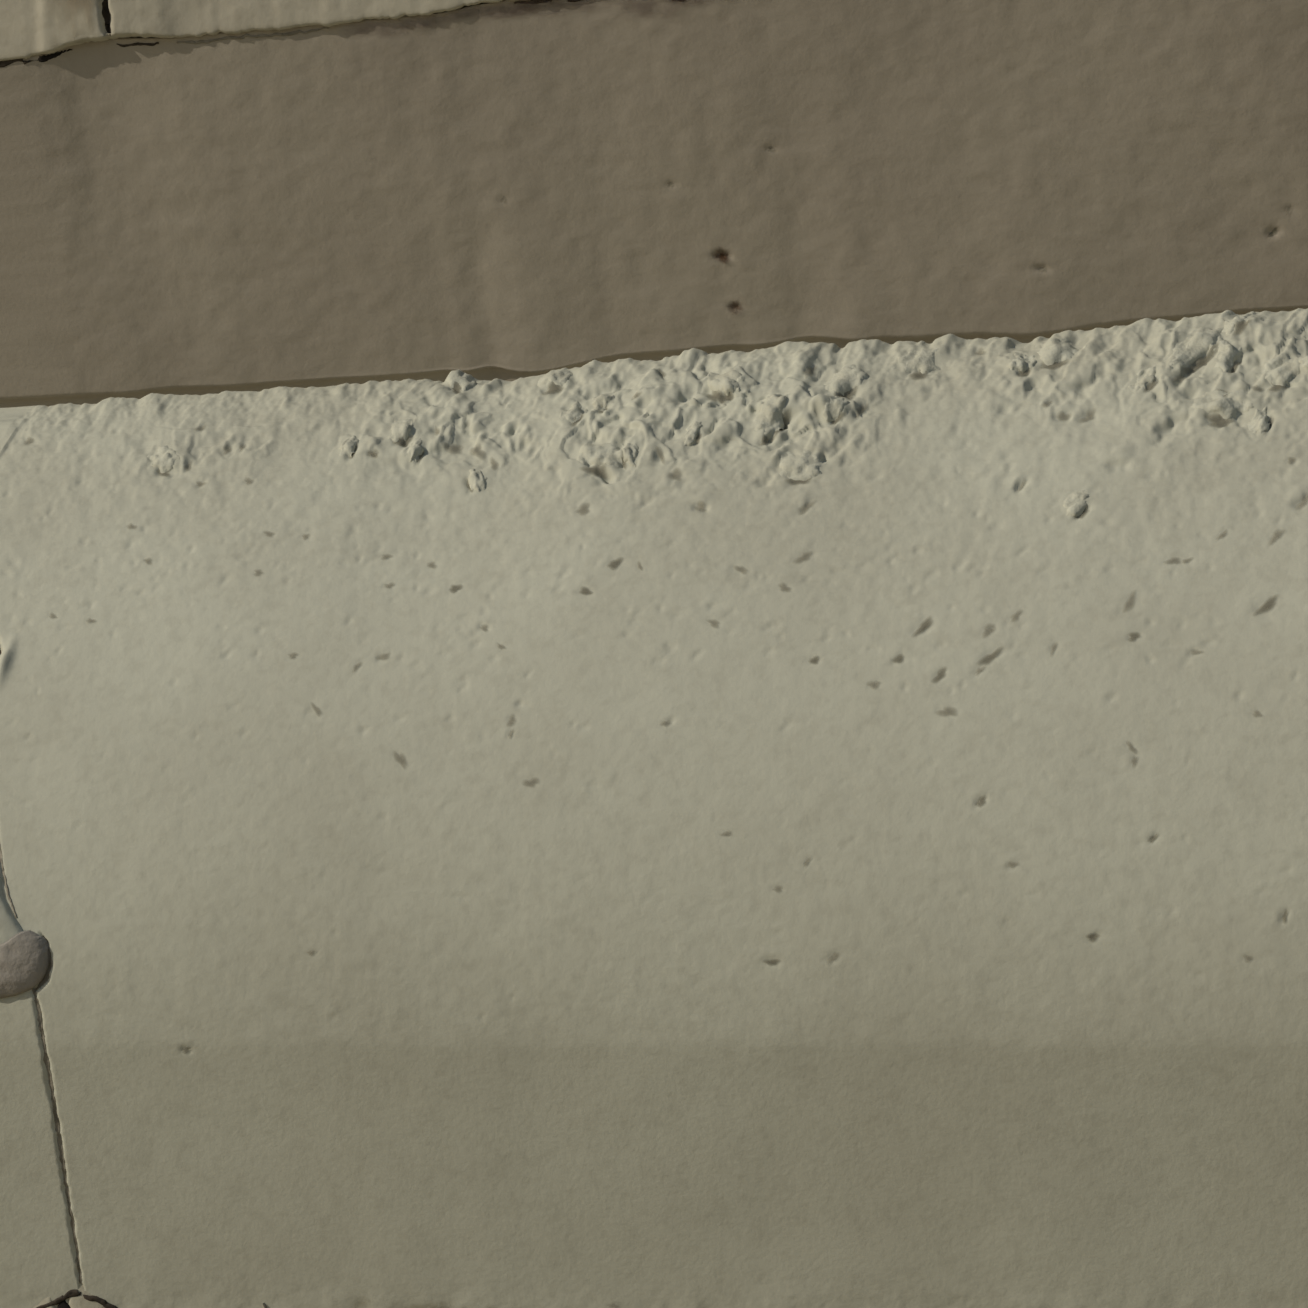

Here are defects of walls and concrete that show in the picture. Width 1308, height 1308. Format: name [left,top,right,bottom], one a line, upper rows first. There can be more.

crack [0,844,17,917]
crack [32,988,118,1308]